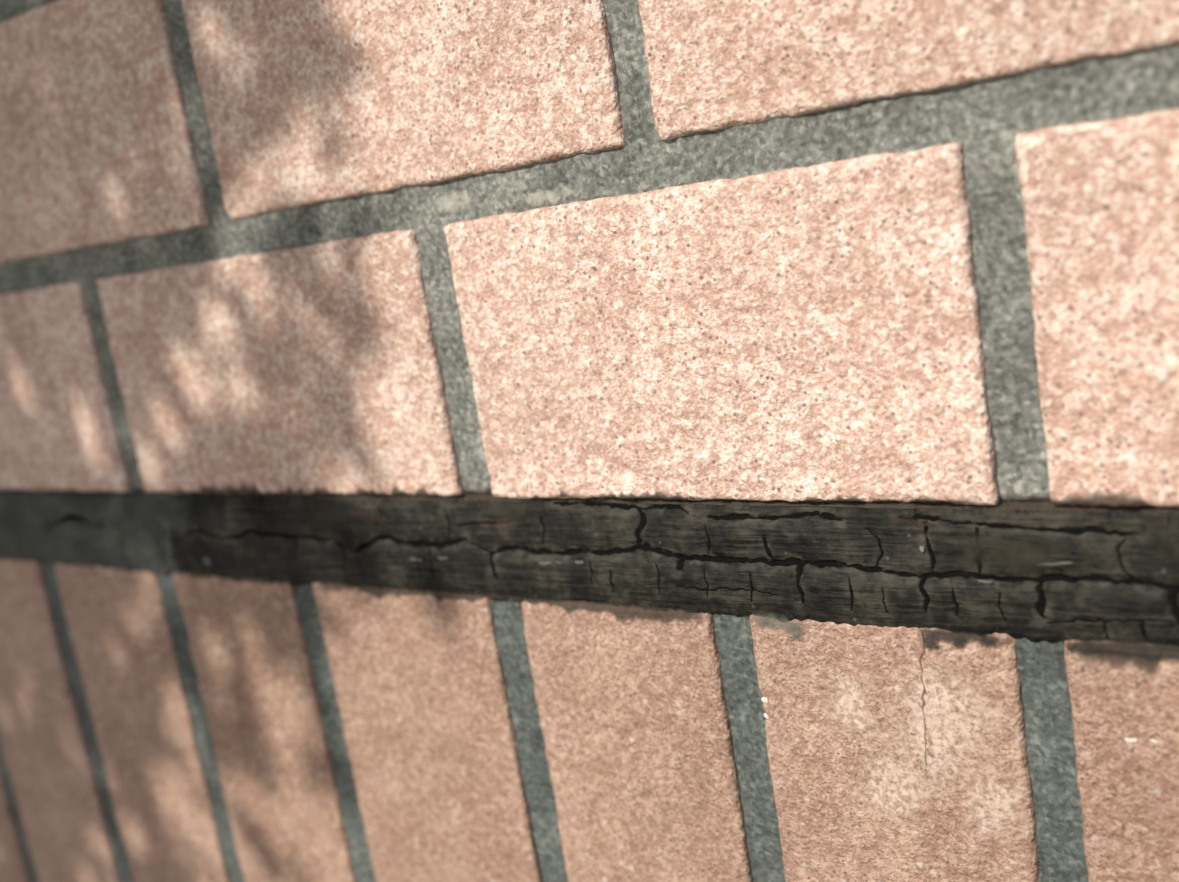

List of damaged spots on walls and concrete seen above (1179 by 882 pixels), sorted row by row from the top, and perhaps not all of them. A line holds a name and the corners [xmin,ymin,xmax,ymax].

crack [183,500,1179,766]